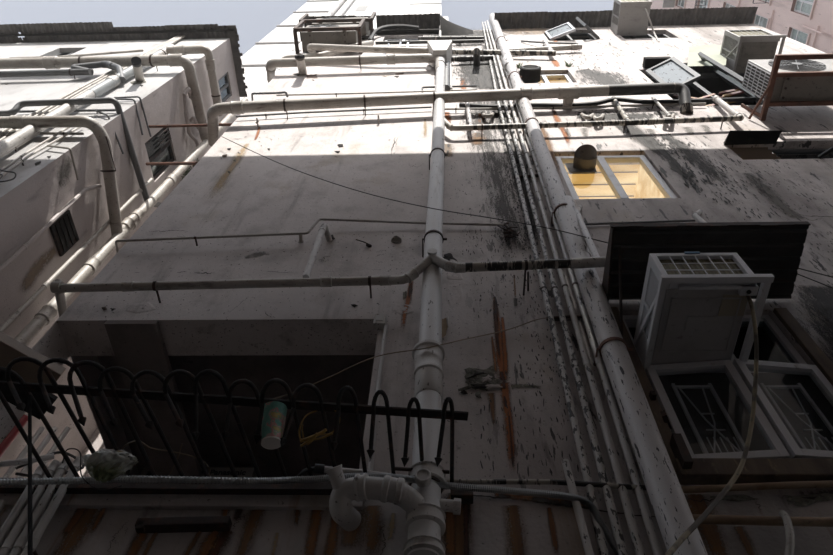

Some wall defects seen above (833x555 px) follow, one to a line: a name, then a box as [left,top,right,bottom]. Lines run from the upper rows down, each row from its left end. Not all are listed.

leakage [452,54,499,89]
leakage [643,129,729,186]
leakage [502,141,538,240]
corrosion [487,297,515,465]
corrosion [184,509,265,555]
corrosion [304,510,362,555]
corrosion [443,504,472,555]